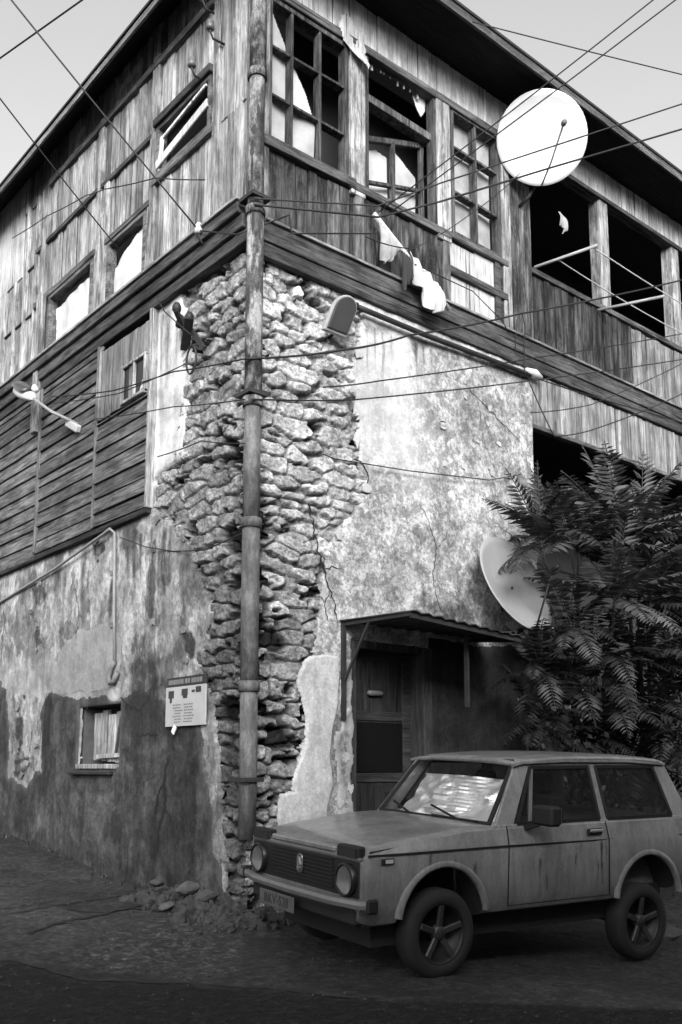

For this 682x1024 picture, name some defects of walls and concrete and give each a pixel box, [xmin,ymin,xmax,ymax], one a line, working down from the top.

crack [419,505,449,612]
water stain [44,698,53,735]
water stain [129,655,162,743]
crack [120,687,171,852]
spalling [180,626,203,674]
peeling [334,659,354,814]